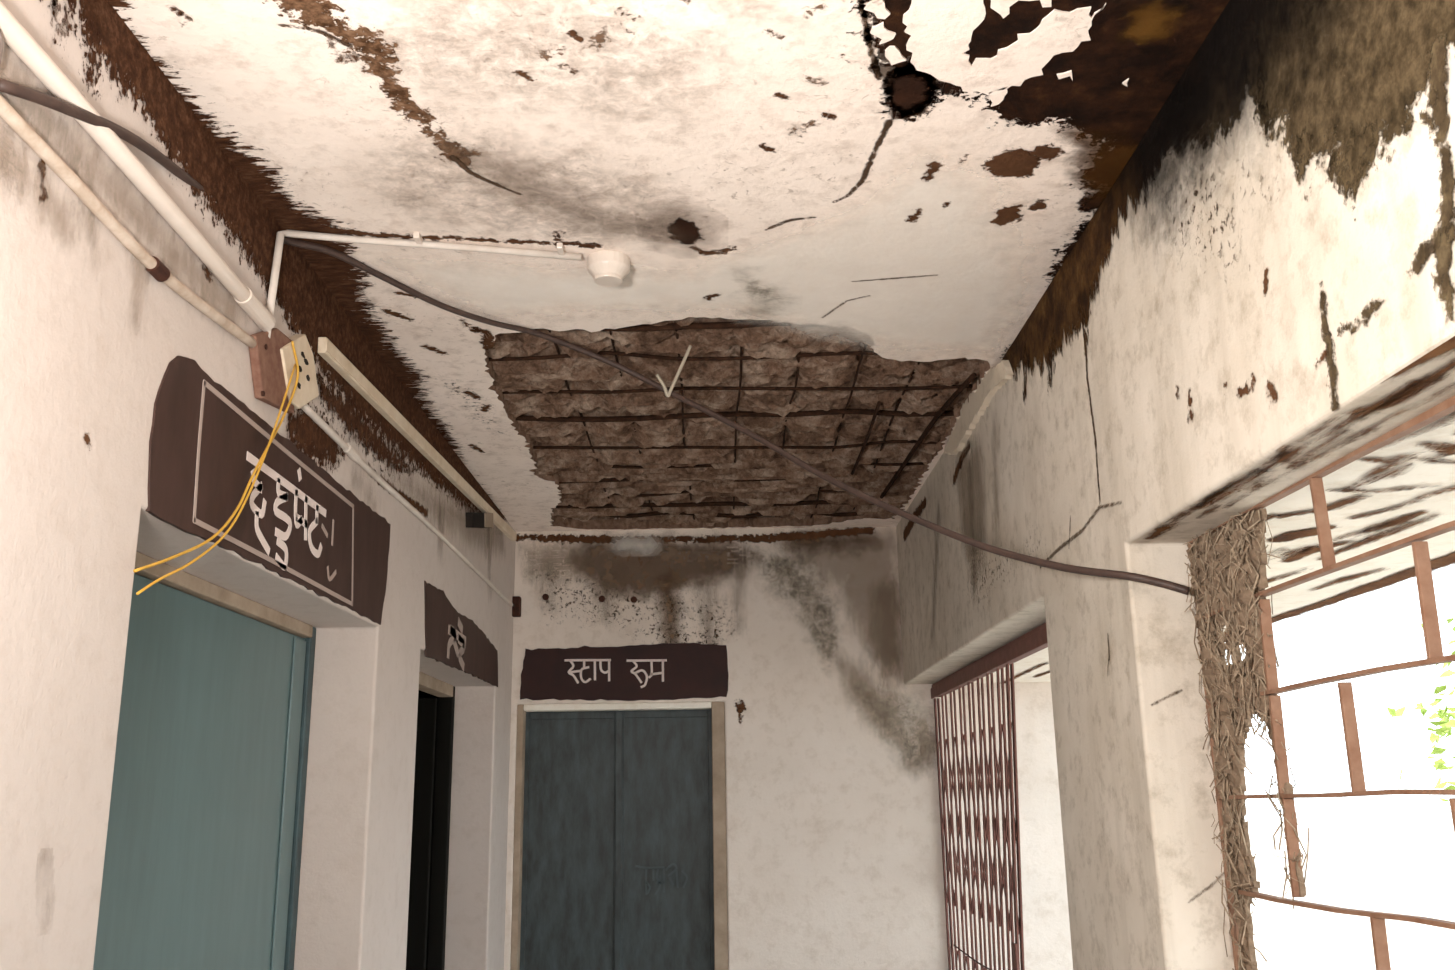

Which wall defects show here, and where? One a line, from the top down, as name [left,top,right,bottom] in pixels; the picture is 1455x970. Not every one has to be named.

spalling [39,0,1015,547]
crack [766,120,893,230]
crack [857,0,882,80]
peeling [846,0,1230,287]
crack [1040,329,1121,568]
water stain [536,539,751,644]